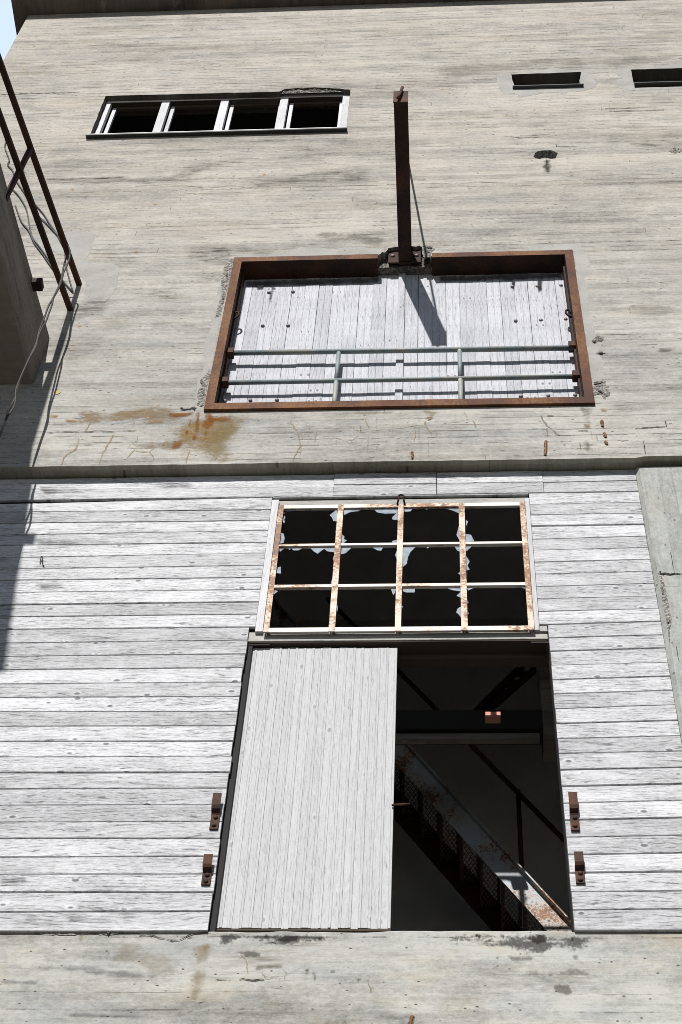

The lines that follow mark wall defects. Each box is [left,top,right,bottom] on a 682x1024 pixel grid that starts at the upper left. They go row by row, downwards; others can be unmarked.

rust [53,408,236,459]